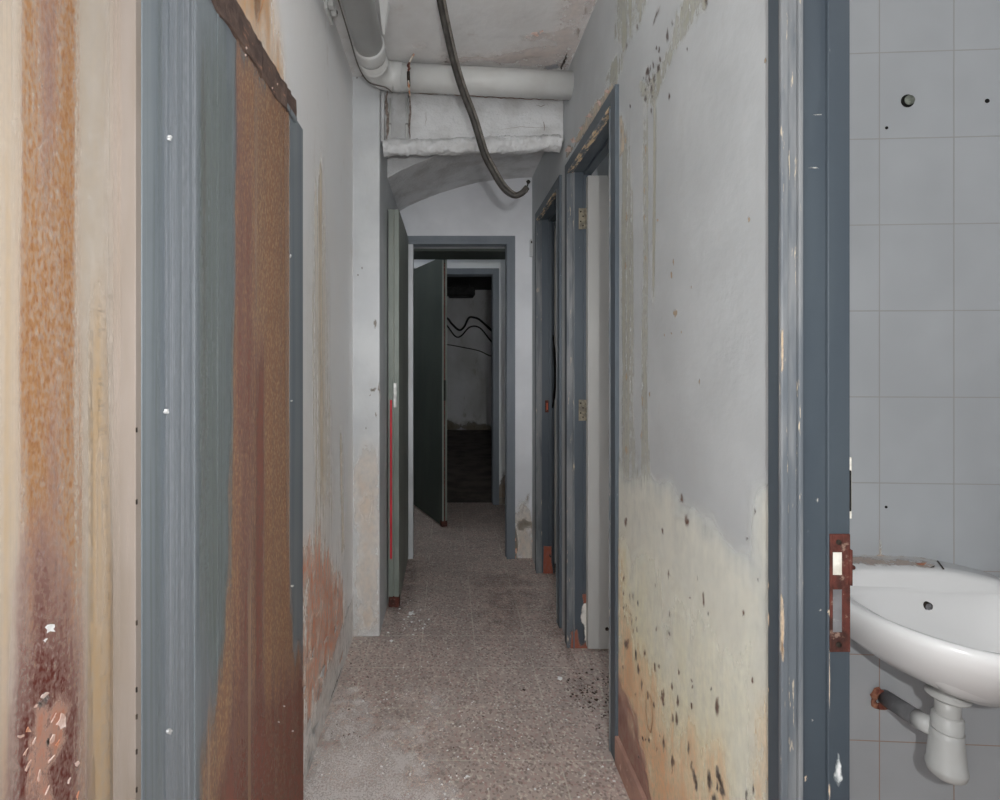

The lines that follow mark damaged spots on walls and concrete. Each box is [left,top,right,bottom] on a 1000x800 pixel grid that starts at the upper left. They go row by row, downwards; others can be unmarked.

peeling [17,692,67,800]
corrosion [0,0,113,800]
corrosion [201,39,344,800]
peeling [565,85,613,155]
water stain [618,0,768,800]